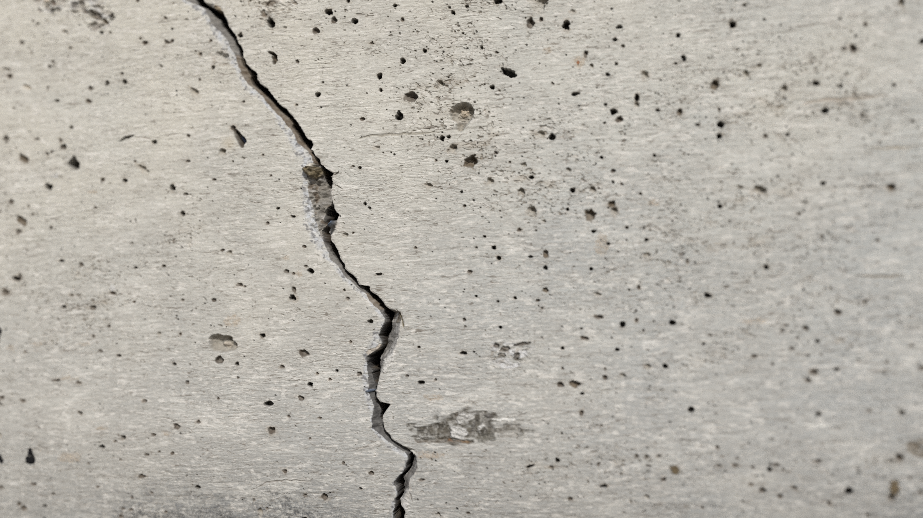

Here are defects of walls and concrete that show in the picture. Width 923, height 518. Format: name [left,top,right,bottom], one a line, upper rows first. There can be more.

crack [181,0,419,518]